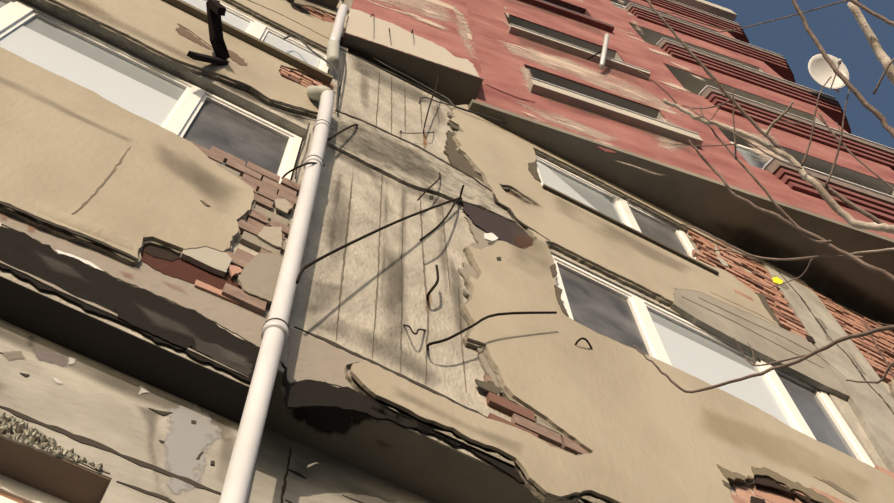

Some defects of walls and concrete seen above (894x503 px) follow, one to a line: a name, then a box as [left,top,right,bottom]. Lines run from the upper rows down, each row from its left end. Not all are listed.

flaking render [279,66,334,91]
flaking render [290,4,335,23]
peeling [339,8,484,80]
crack [0,146,136,260]
flaking render [141,142,301,316]
flaking render [443,112,483,182]
spalling [460,202,534,249]
flaking render [528,162,541,183]
flaking render [550,263,569,317]
flaking render [687,230,894,384]
flaking render [475,347,589,455]
flaking render [717,464,846,503]